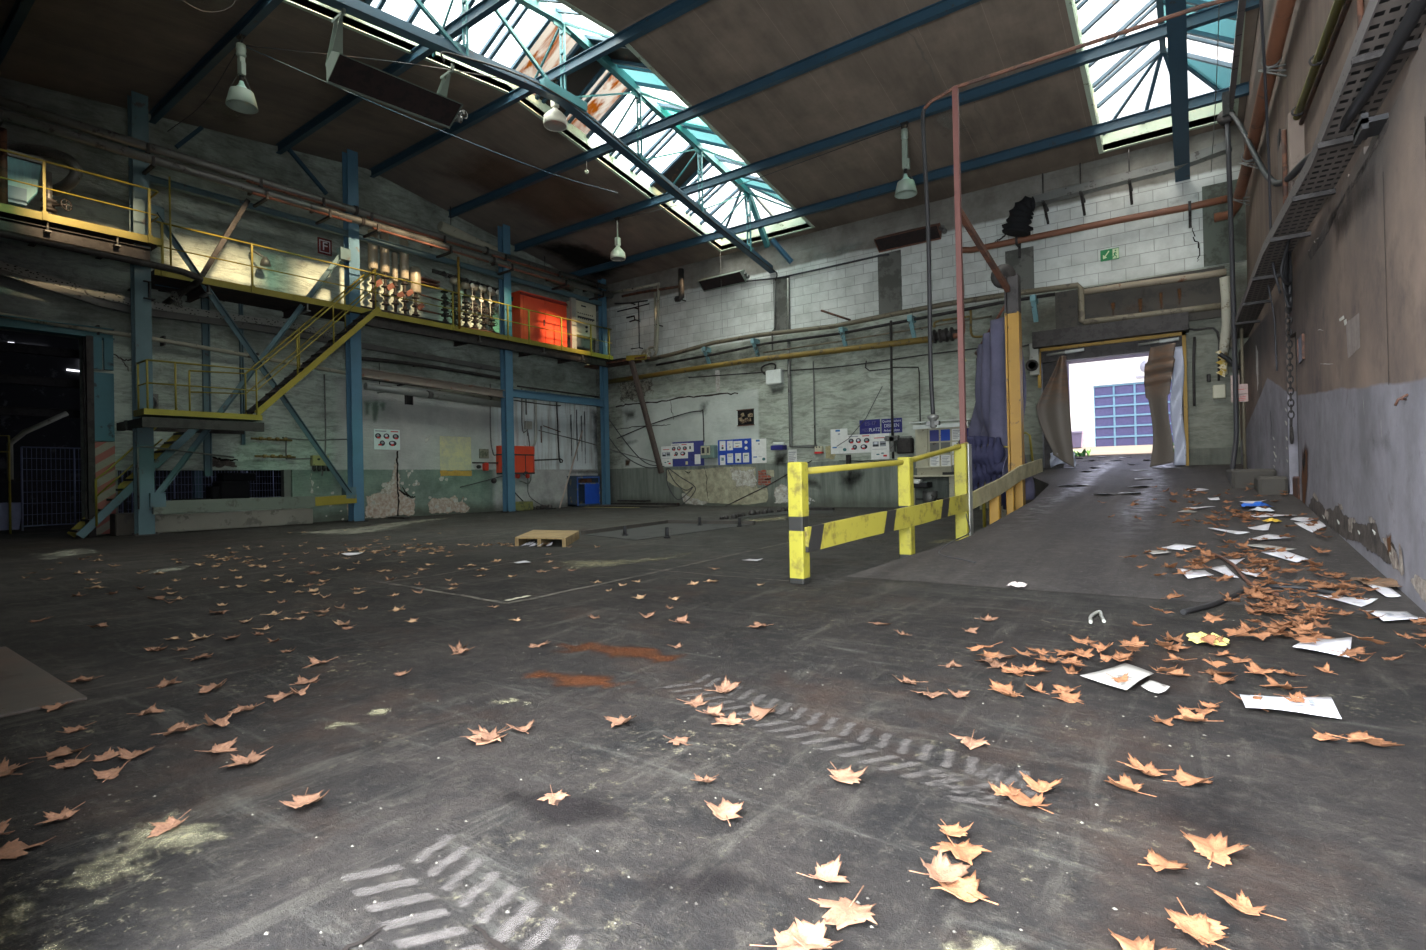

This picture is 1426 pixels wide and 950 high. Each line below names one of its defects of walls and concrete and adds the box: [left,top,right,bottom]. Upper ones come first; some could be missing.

spalling [310,436,472,520]
spalling [667,466,788,505]